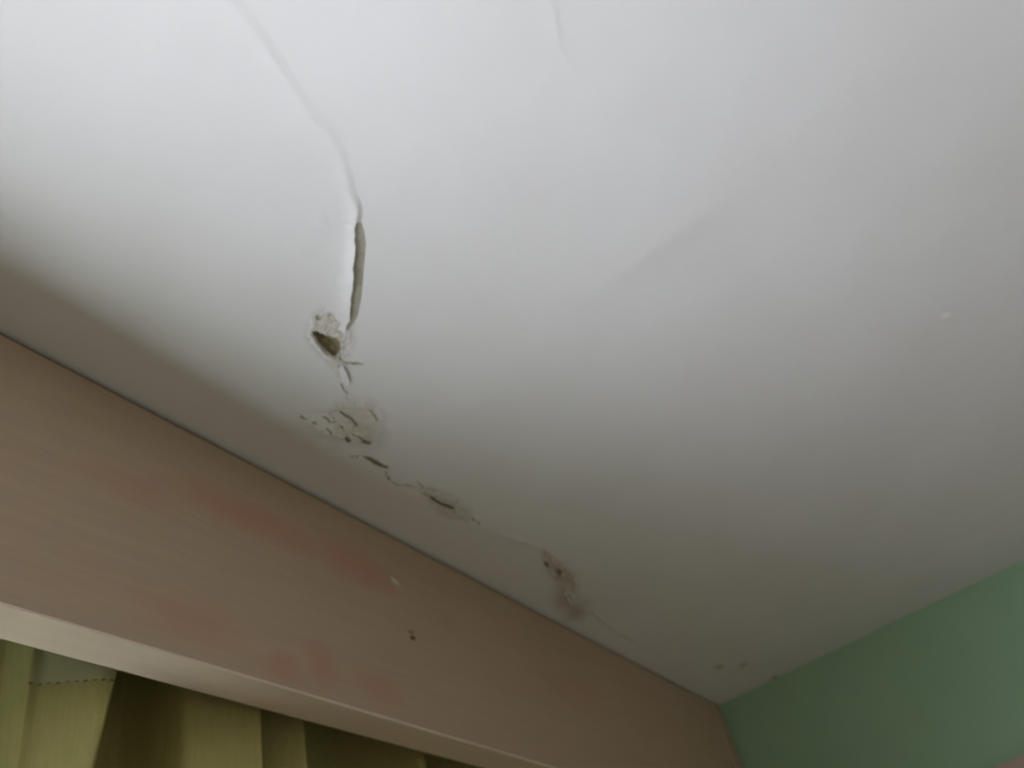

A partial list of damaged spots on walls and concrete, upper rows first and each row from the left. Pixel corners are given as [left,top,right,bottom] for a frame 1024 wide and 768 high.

flaking render [297,219,385,449]
crack [349,452,547,554]